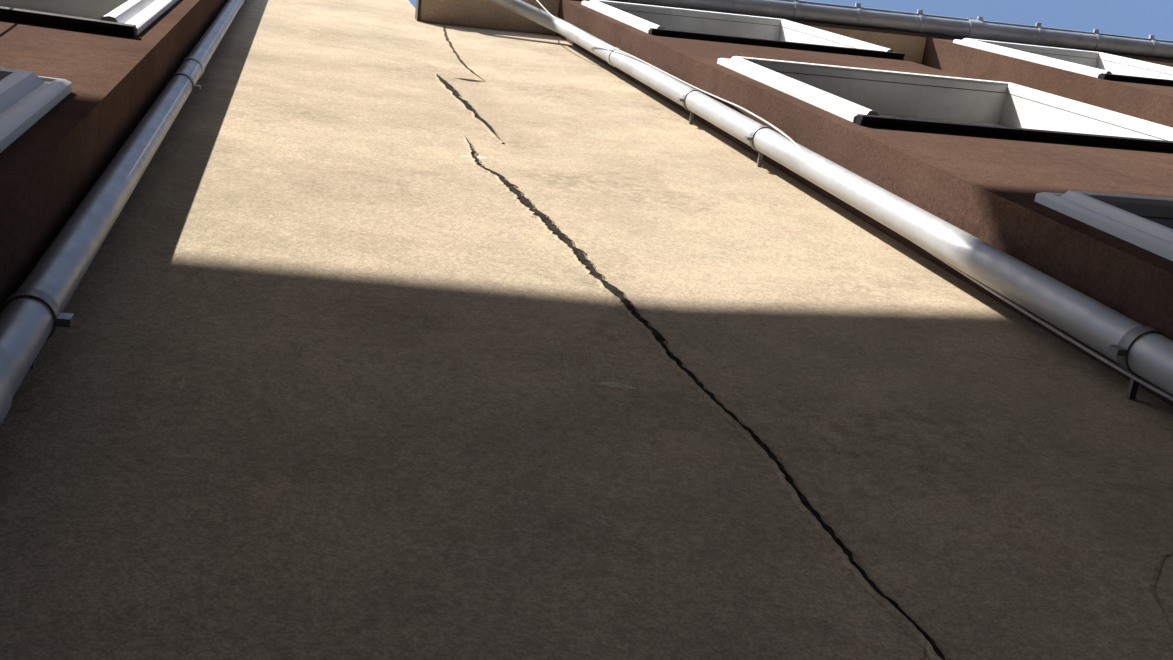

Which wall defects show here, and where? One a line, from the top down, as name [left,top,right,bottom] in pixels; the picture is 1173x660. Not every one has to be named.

crack [434,24,949,660]